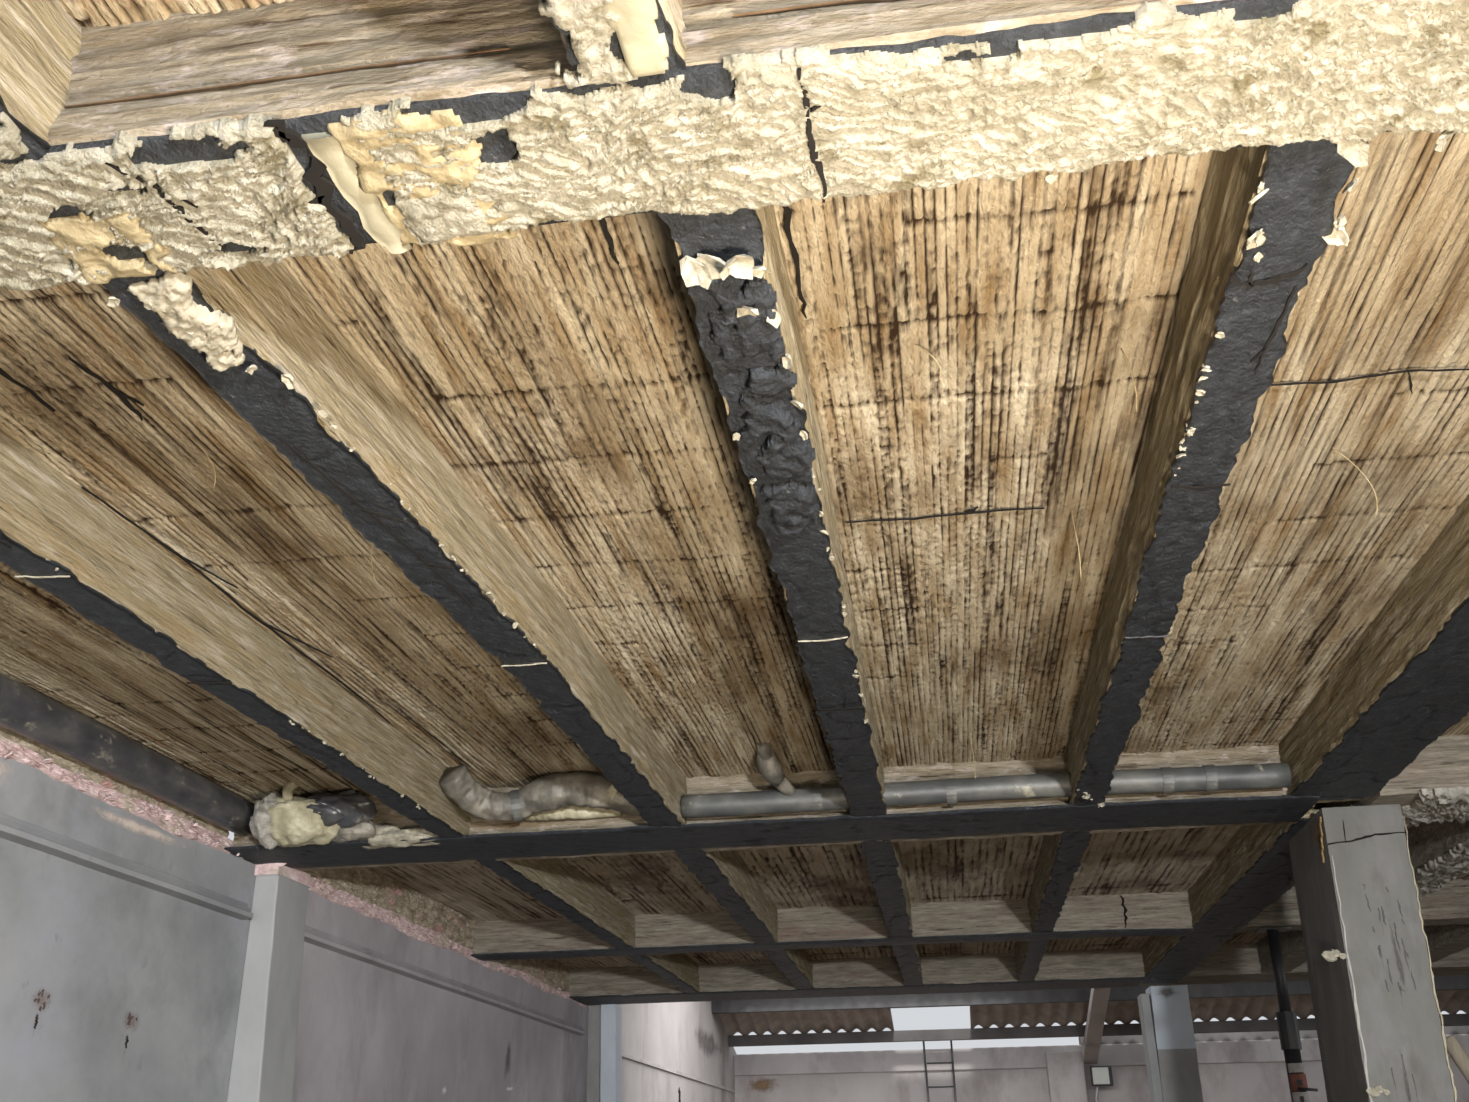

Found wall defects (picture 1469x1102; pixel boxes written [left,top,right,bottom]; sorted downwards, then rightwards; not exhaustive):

corrosion [33,989,50,1029]